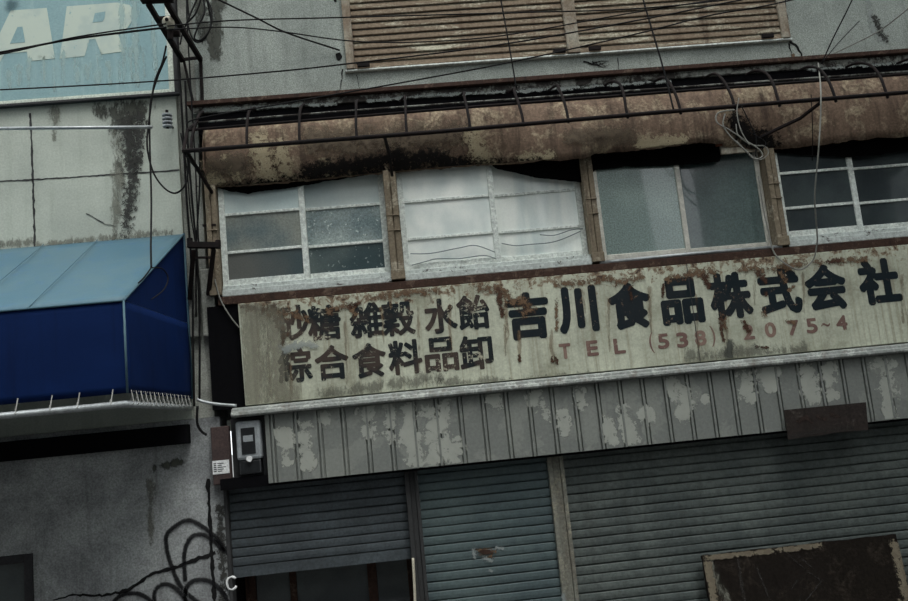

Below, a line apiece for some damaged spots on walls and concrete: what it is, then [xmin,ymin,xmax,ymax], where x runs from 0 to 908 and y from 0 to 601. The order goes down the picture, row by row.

damp [0,99,173,247]
rust [470,283,538,318]
rust [553,273,645,300]
rust [661,267,719,298]
rust [735,256,868,296]
rust [718,311,728,342]
peeling [665,376,712,425]
peeling [734,366,783,407]
peeling [797,361,841,406]
peeling [869,356,902,419]
peeling [354,398,468,468]
peeling [601,403,656,447]